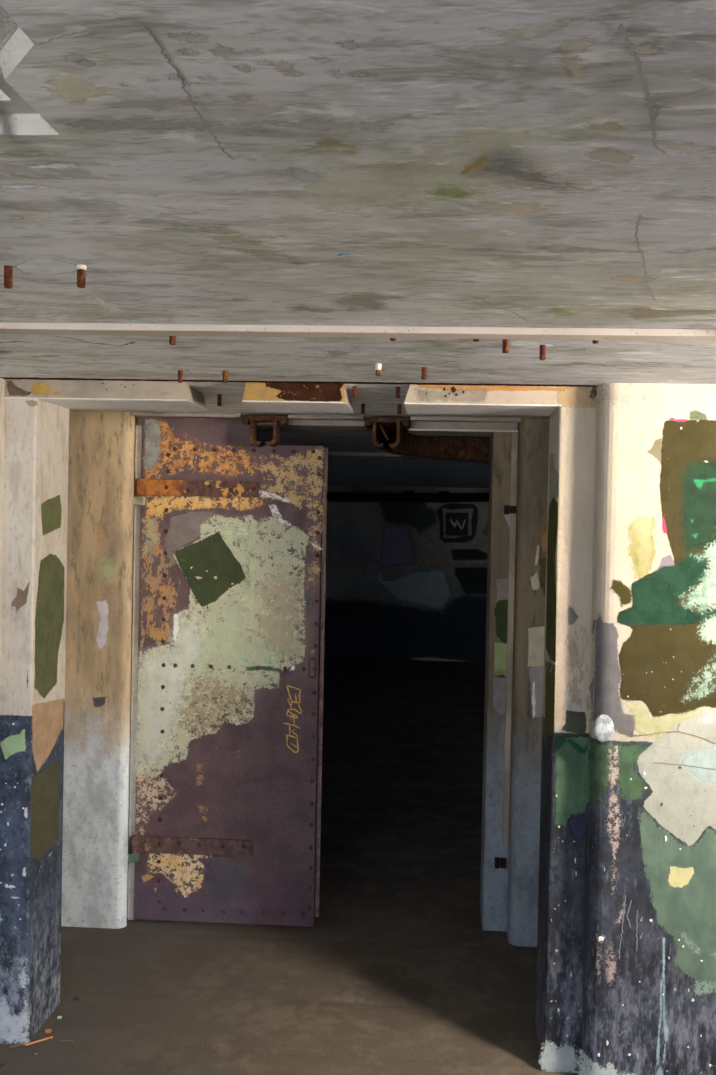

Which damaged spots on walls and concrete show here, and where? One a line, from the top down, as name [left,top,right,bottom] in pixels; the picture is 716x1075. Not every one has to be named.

crack [37,23,233,160]
crack [618,23,668,155]
crack [634,214,657,301]
corrosion [0,377,599,408]
corrosion [138,419,326,647]
leakage [0,955,30,1044]
leakage [538,1040,636,1075]
leakage [657,938,669,1075]